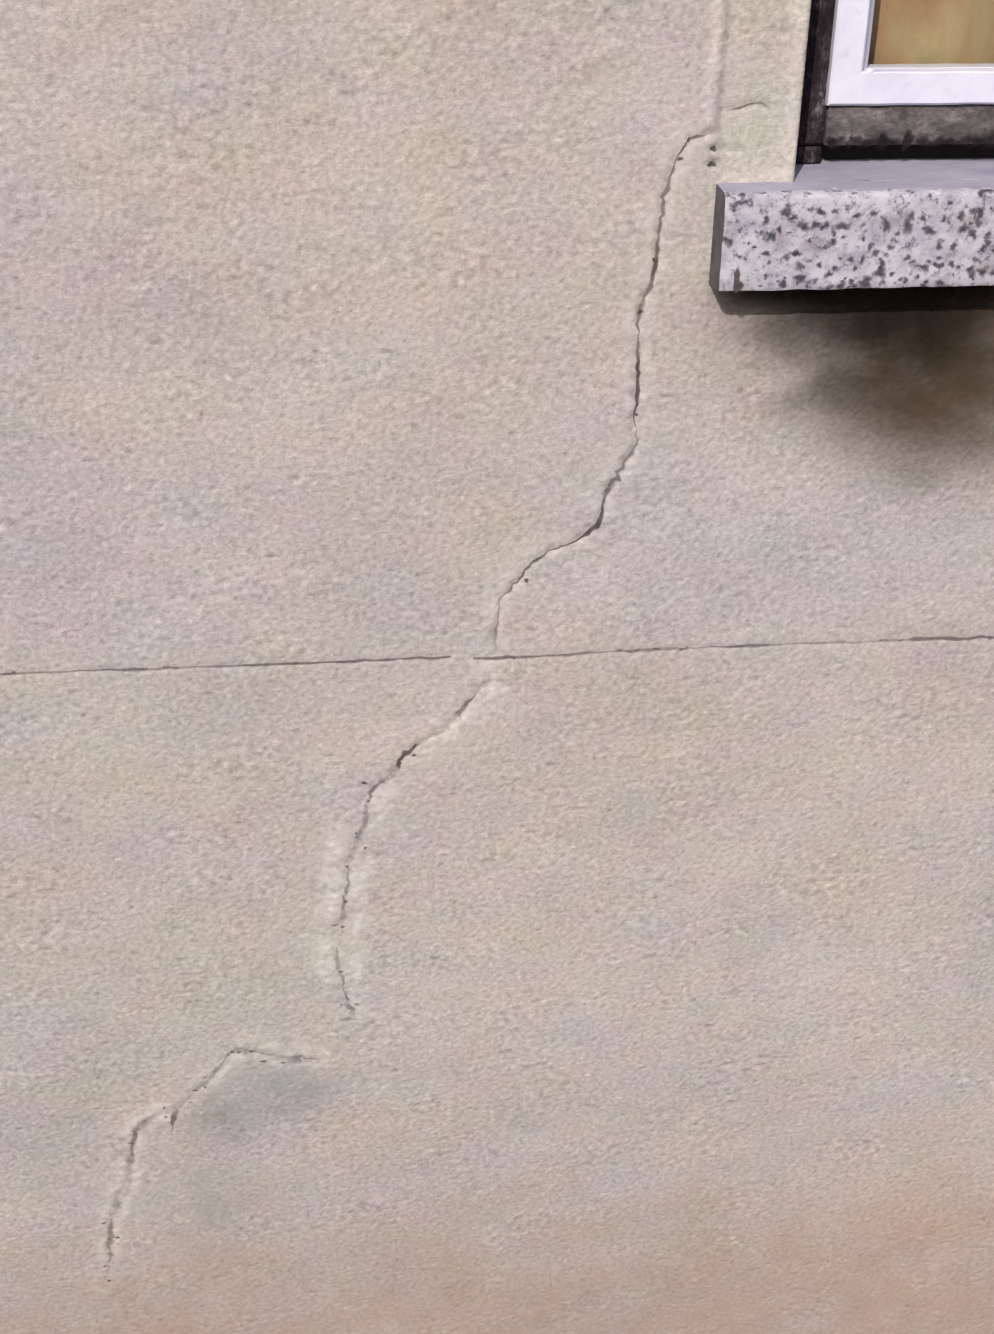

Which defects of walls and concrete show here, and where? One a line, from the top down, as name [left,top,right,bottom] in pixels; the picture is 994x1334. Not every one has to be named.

crack [662,135,701,204]
crack [633,240,659,427]
crack [498,479,615,615]
crack [94,665,176,673]
crack [224,644,770,667]
crack [910,634,994,642]
crack [396,744,417,768]
crack [128,1087,206,1155]